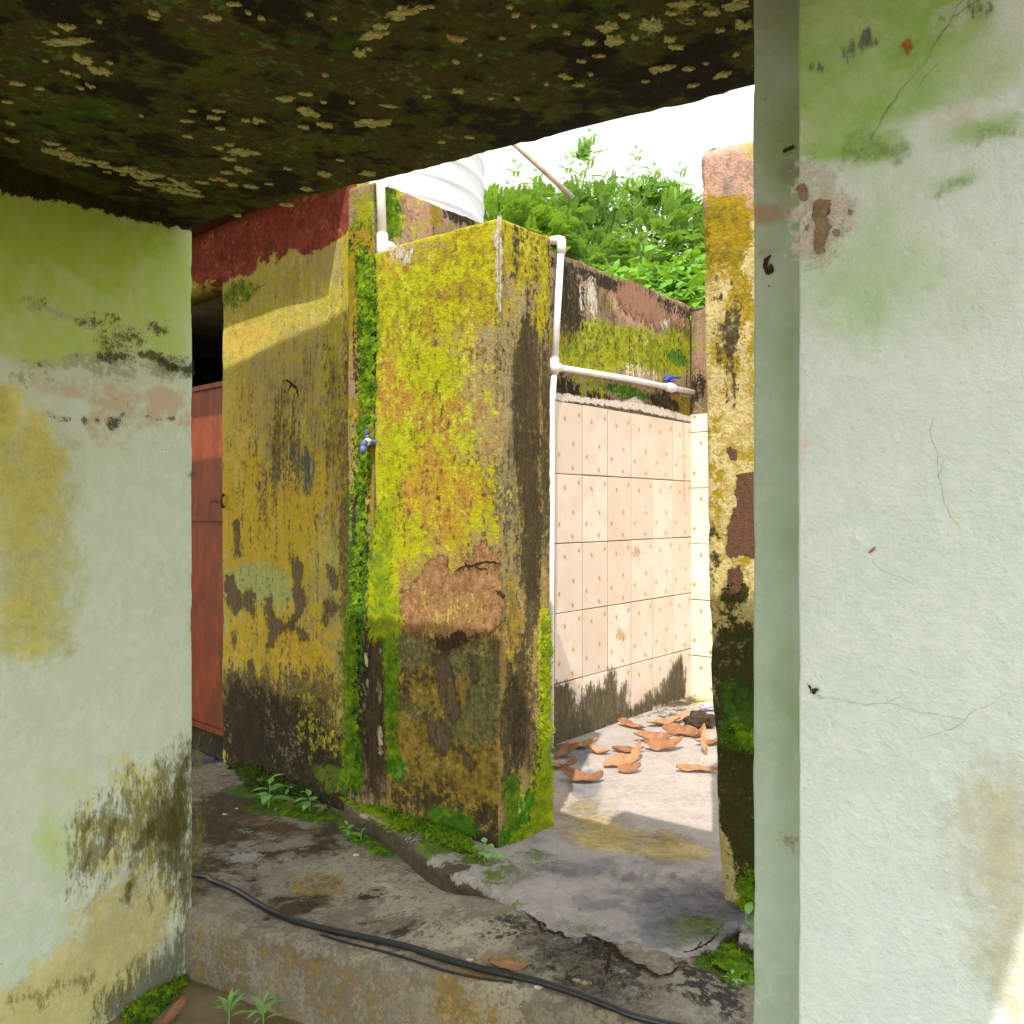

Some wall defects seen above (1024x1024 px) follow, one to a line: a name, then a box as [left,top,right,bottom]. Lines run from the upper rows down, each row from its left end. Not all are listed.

peeling [783,144,856,267]
peeling [763,255,774,287]
damp [75,314,195,379]
damp [509,315,551,601]
peeling [723,446,755,596]
spalling [398,538,505,772]
damp [554,654,687,745]
damp [66,731,211,913]
crack [520,909,724,977]